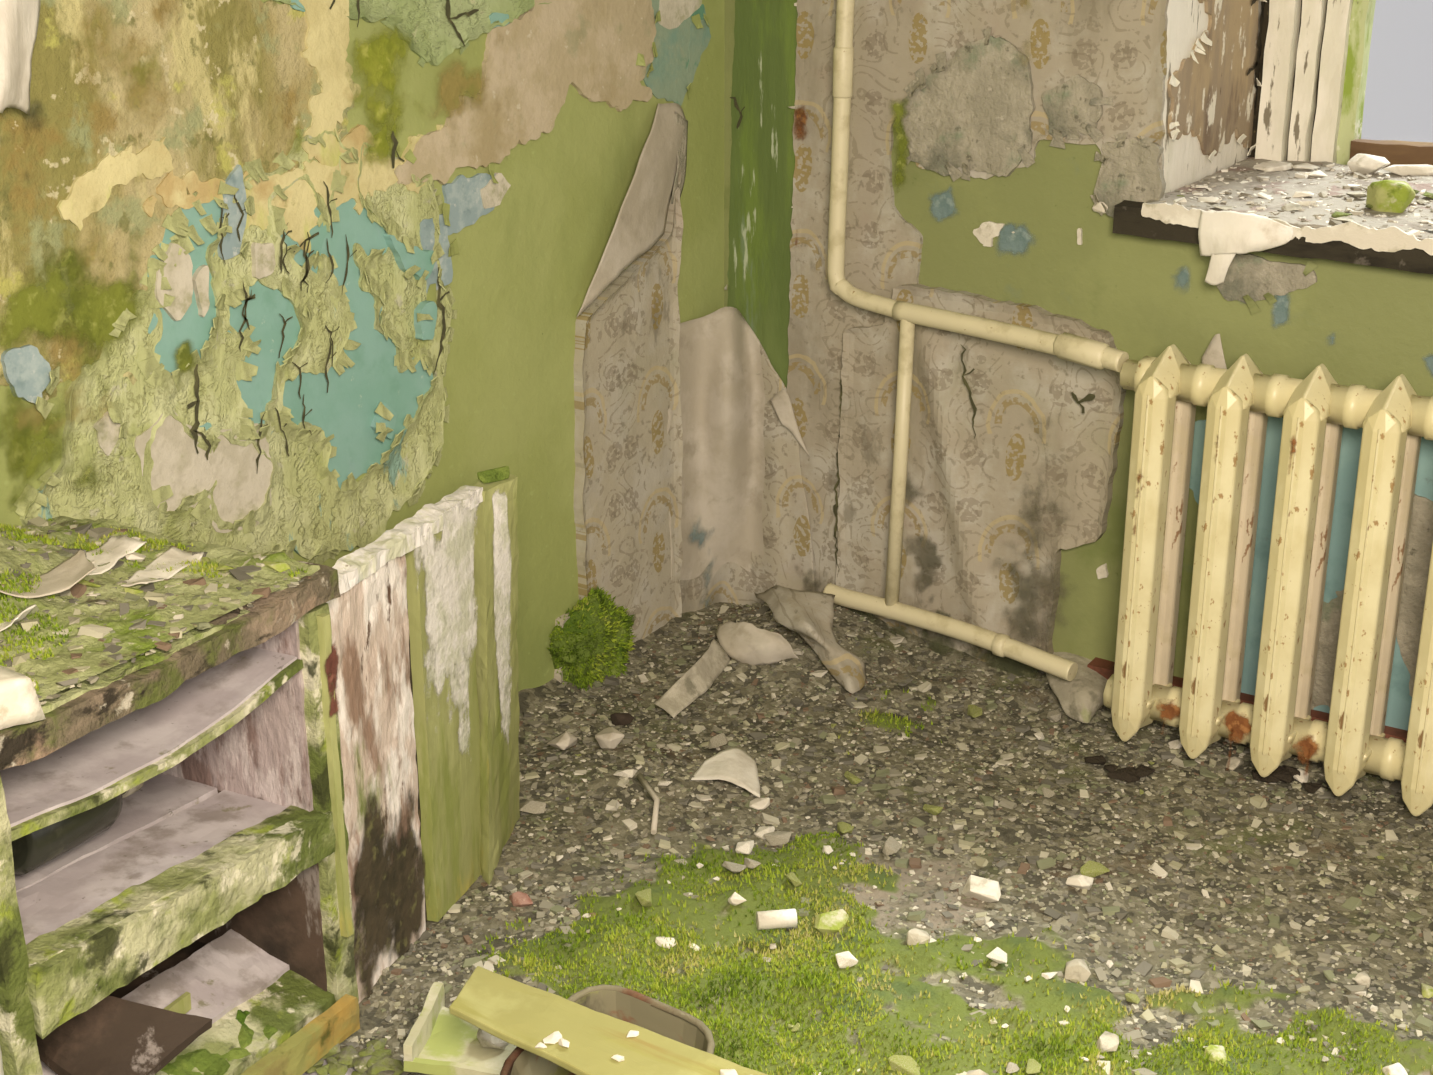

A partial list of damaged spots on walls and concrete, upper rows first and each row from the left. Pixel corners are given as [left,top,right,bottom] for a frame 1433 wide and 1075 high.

crack [329,0,360,27]
crack [446,0,479,47]
flaking render [901,0,1267,221]
crack [187,364,211,460]
crack [219,181,357,472]
flaking render [0,0,711,572]
crack [433,267,450,375]
peeling [1189,420,1206,504]
peeling [1241,416,1283,696]
flaking render [1216,254,1318,325]
peeling [1311,426,1363,713]
flaking render [1385,437,1433,731]